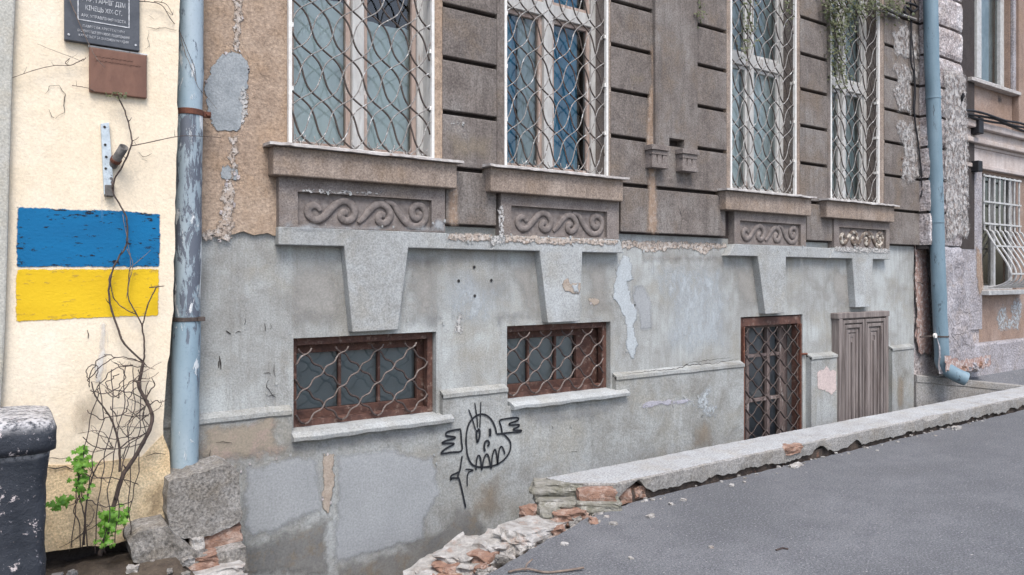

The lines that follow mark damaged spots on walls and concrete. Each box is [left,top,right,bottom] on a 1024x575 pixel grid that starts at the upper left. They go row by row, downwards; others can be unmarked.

flaking render [892,25,921,184]
peeling [202,135,240,242]
peeling [422,205,727,359]
flaking render [914,245,991,372]
spalling [535,511,604,547]